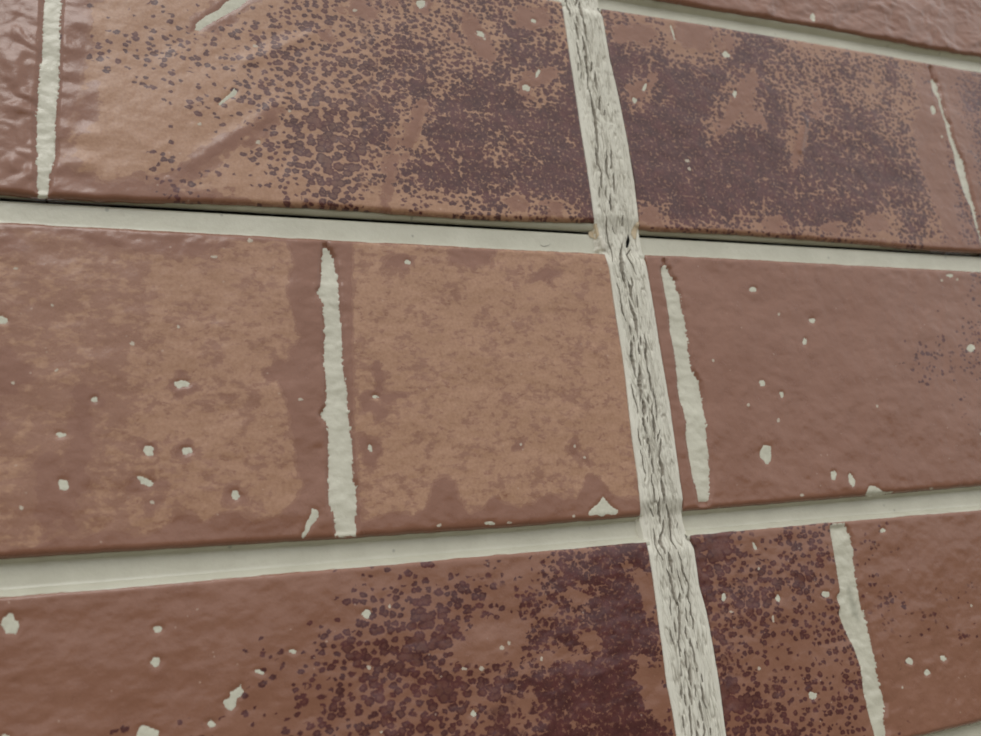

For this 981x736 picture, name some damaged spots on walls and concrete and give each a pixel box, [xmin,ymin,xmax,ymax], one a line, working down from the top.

peeling [195,0,248,31]
crack [565,0,711,736]